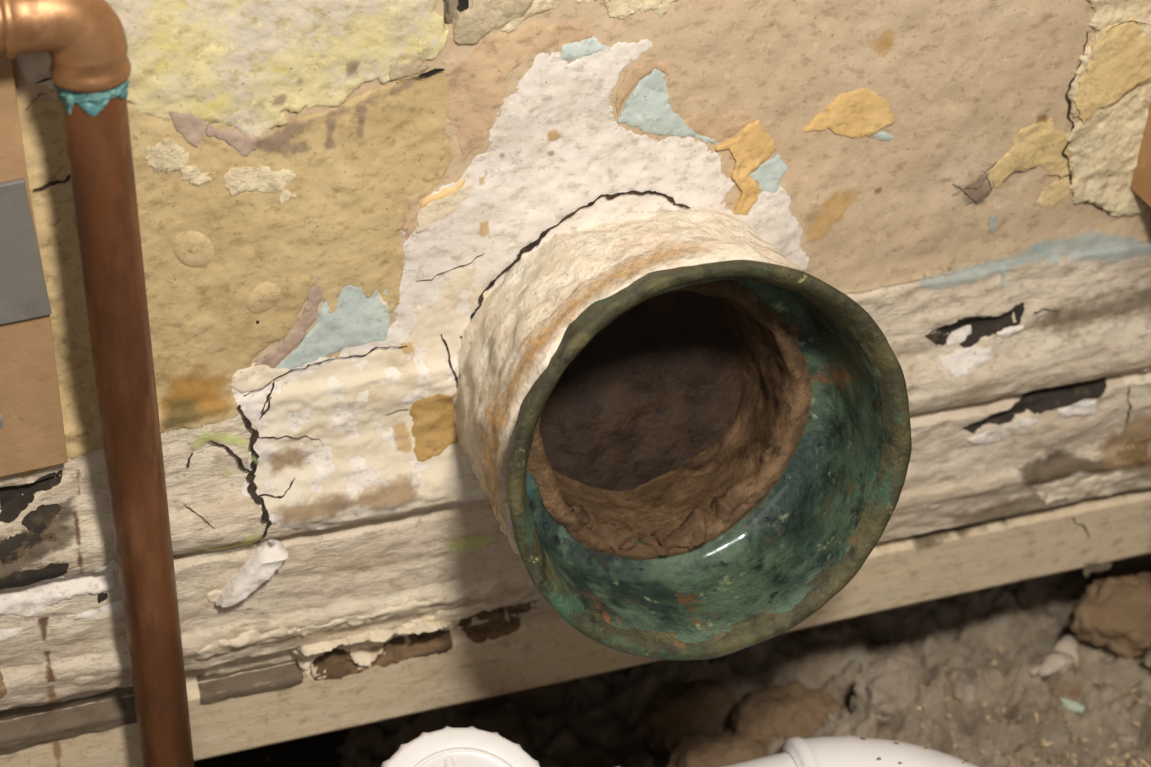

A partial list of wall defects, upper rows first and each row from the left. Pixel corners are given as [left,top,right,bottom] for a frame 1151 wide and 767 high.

flaking render [988,0,1151,217]
peeling [0,52,123,641]
crack [187,346,407,544]
peeling [106,0,810,607]
crack [419,190,690,386]
peeling [925,302,1025,378]
peeling [959,377,1107,448]
peeling [1119,369,1151,386]
peeling [195,579,541,681]